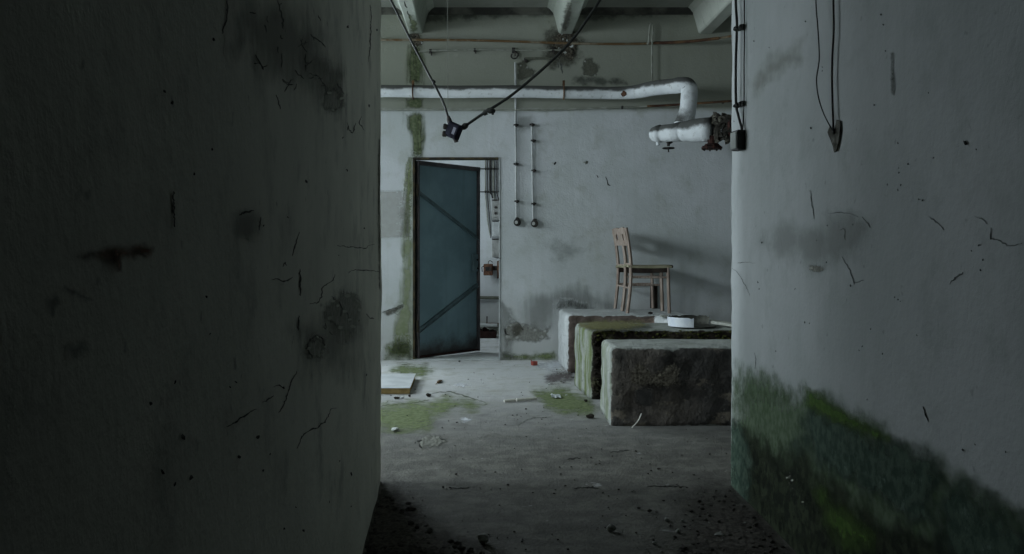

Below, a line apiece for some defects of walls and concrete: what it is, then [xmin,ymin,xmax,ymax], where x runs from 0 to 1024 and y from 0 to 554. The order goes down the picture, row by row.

crack [222,0,364,133]
crack [810,192,870,283]
crack [975,216,1022,246]
flaking render [504,322,549,342]
crack [226,371,297,427]
leakage [756,452,833,548]